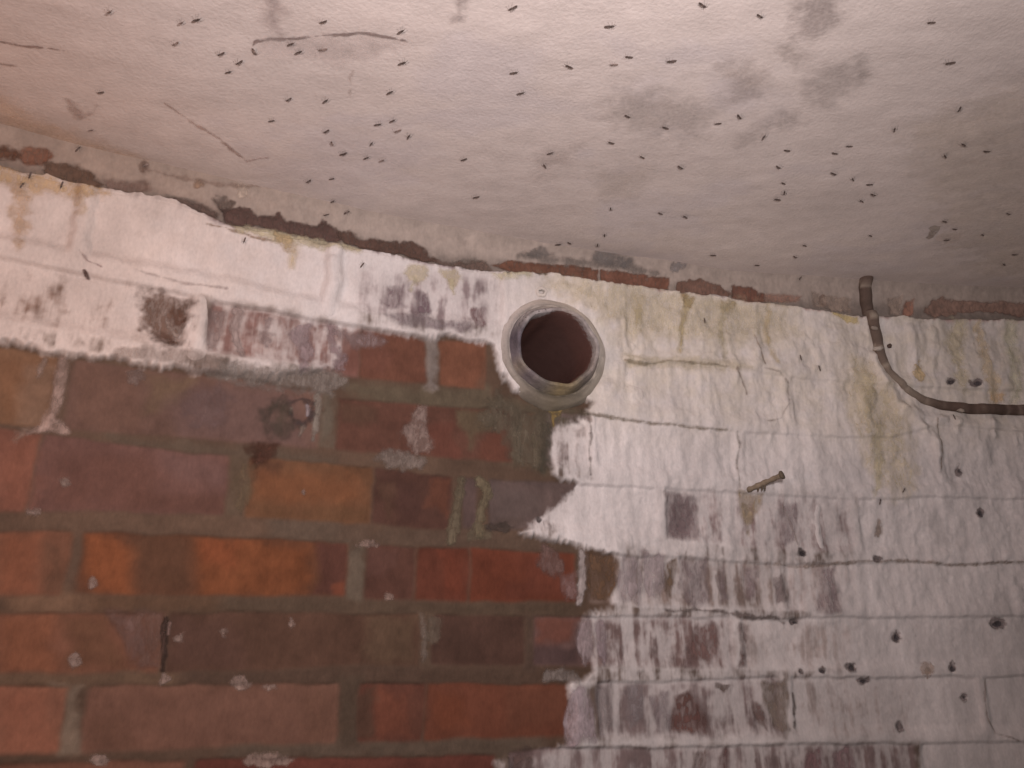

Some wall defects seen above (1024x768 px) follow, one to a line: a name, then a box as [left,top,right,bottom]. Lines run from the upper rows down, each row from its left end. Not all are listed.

crack [167,105,267,160]
spalling [0,146,147,193]
spalling [173,184,799,302]
peeling [139,292,192,345]
peeling [386,289,485,332]
spalling [888,296,1024,318]
crack [160,617,171,672]